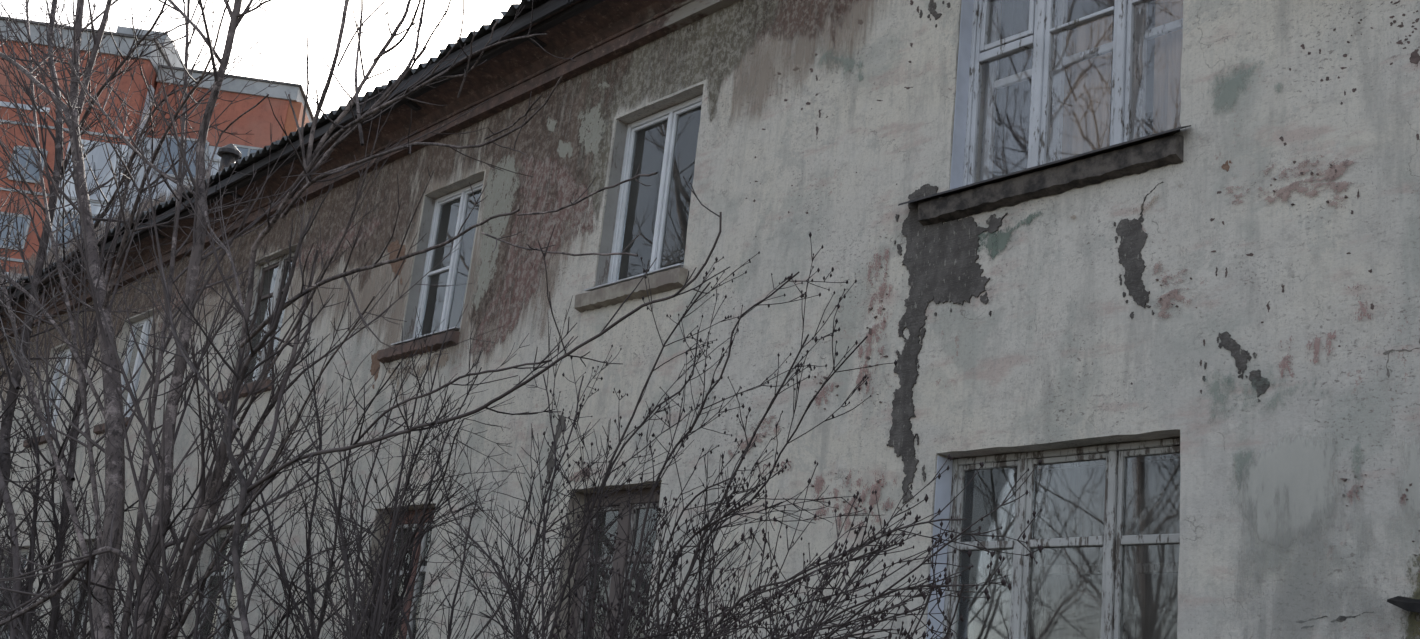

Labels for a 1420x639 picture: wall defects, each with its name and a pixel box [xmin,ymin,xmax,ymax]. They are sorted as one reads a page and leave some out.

spalling [910,0,951,28]
peeling [770,53,828,138]
leakage [0,0,873,399]
spalling [1114,215,1197,319]
spalling [809,184,1008,530]
spalling [1199,330,1340,402]